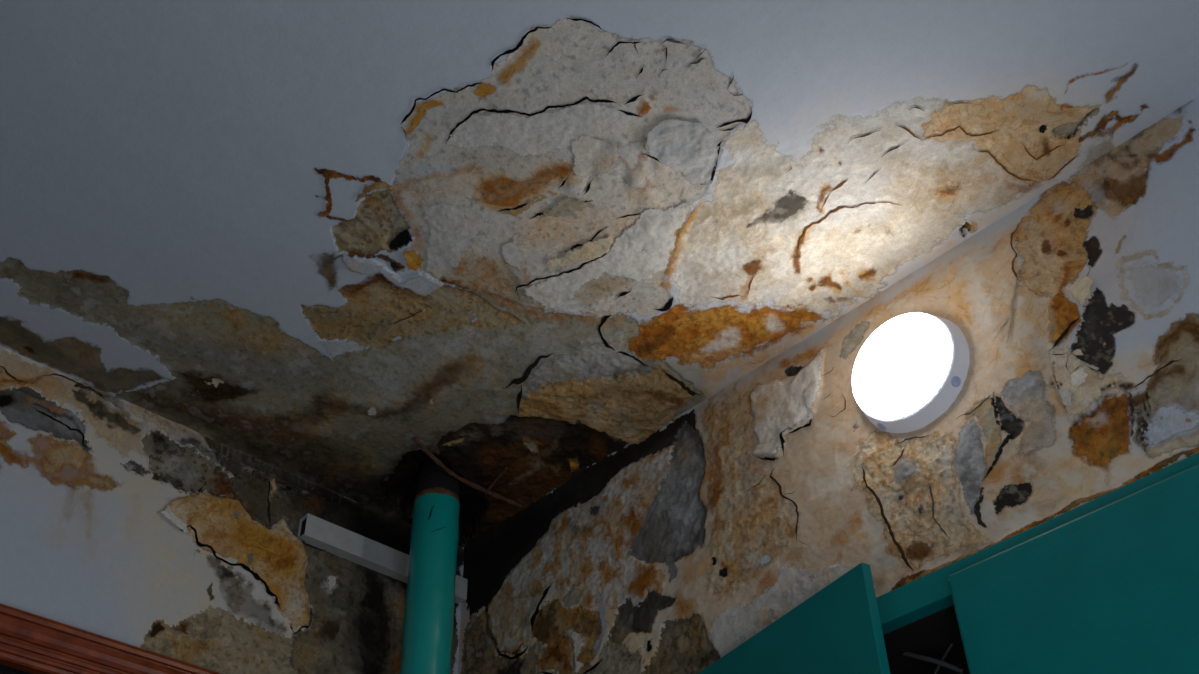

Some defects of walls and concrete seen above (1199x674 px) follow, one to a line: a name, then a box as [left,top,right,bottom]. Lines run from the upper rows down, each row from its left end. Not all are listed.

corrosion [0,422,116,490]
damp [0,317,412,674]
flaking render [141,492,311,674]
crack [178,525,313,634]
flaking render [0,17,1034,525]
crack [400,18,707,142]
flaking render [485,421,852,674]
crack [700,76,752,185]
corrosion [629,304,826,368]
crack [797,102,1078,249]
spalling [848,236,1137,572]
corrosion [1014,64,1195,346]